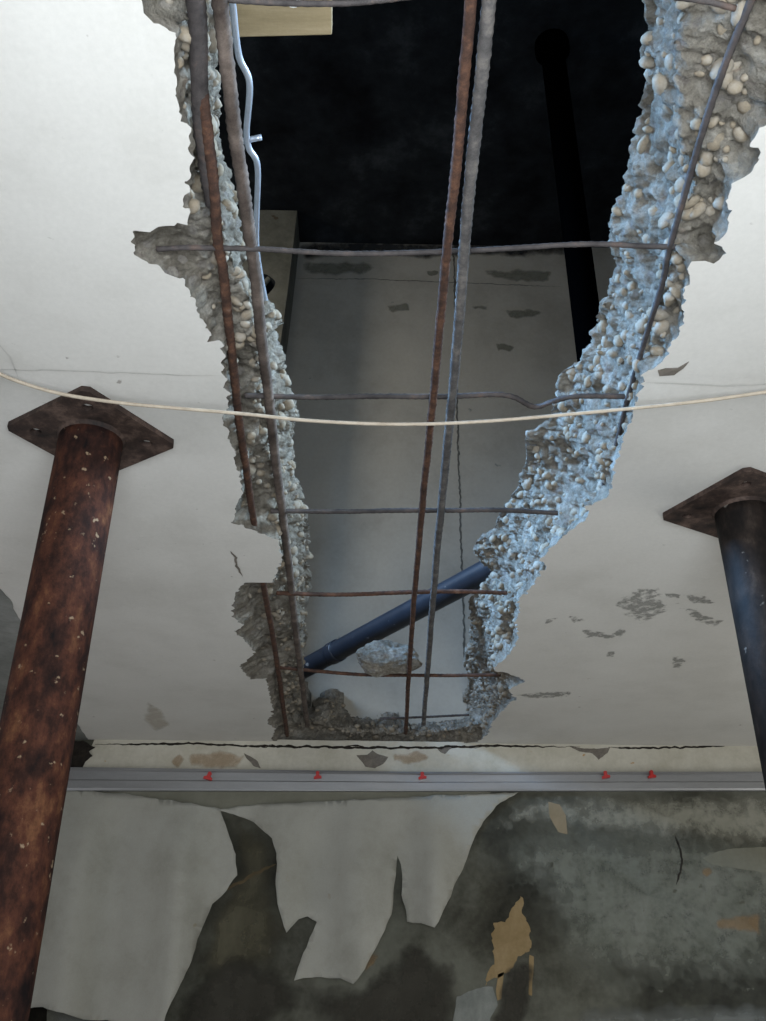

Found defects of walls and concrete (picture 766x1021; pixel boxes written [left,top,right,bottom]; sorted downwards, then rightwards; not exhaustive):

spalling [131,0,766,768]
crack [96,742,574,750]
crack [612,743,724,751]
peeling [511,798,766,980]
peeling [486,896,534,1021]
peeling [29,1007,47,1021]
leakage [585,1008,766,1021]